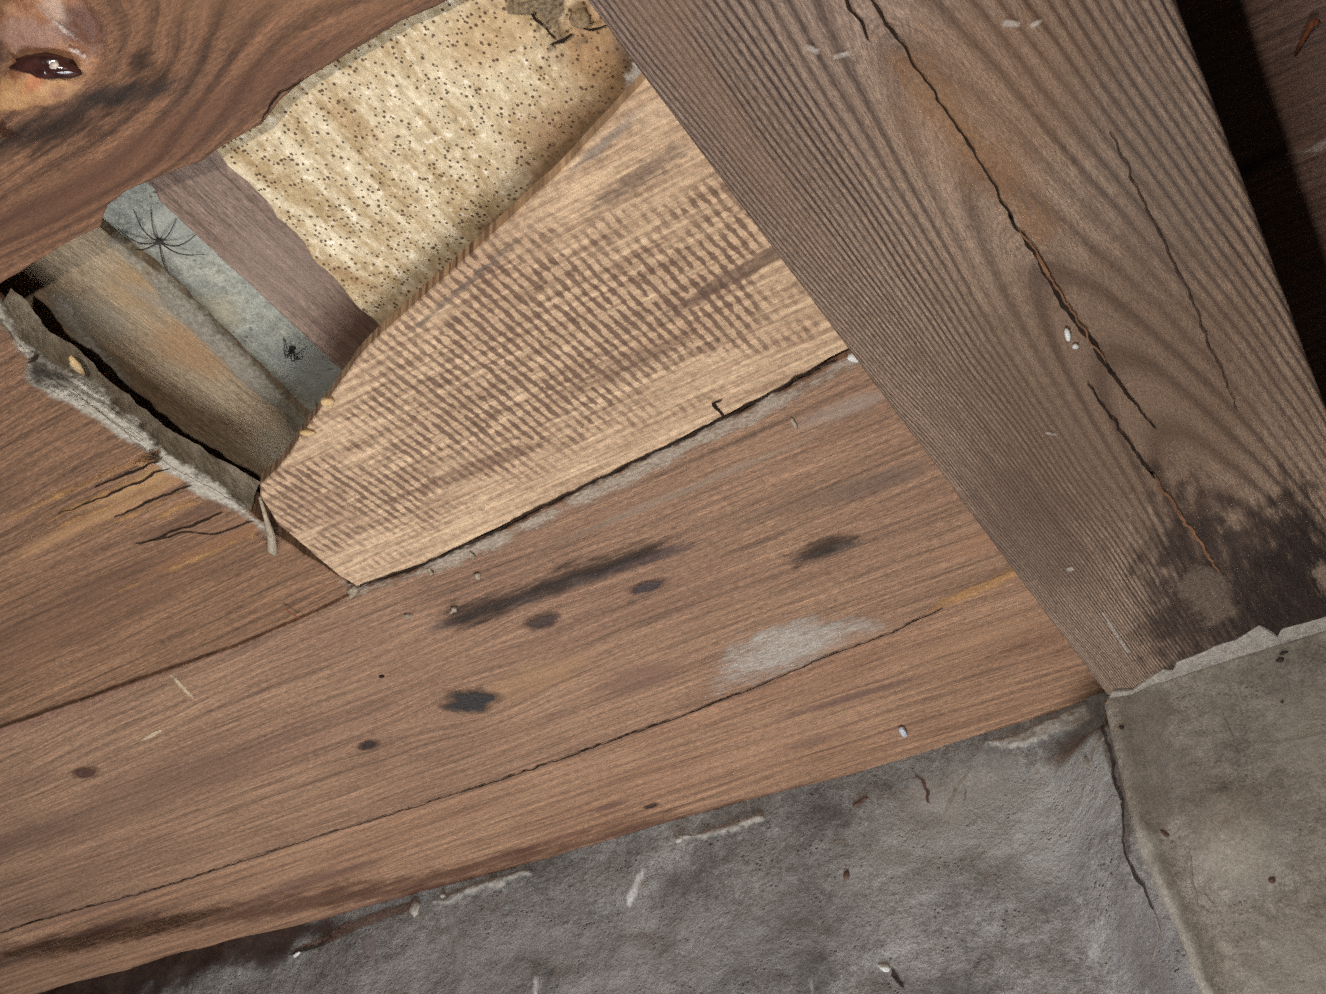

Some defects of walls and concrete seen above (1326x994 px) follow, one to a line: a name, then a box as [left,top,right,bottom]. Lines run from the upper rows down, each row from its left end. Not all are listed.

damp [446,545,661,630]
damp [796,537,856,568]
damp [1130,473,1326,670]
crack [1090,723,1160,962]